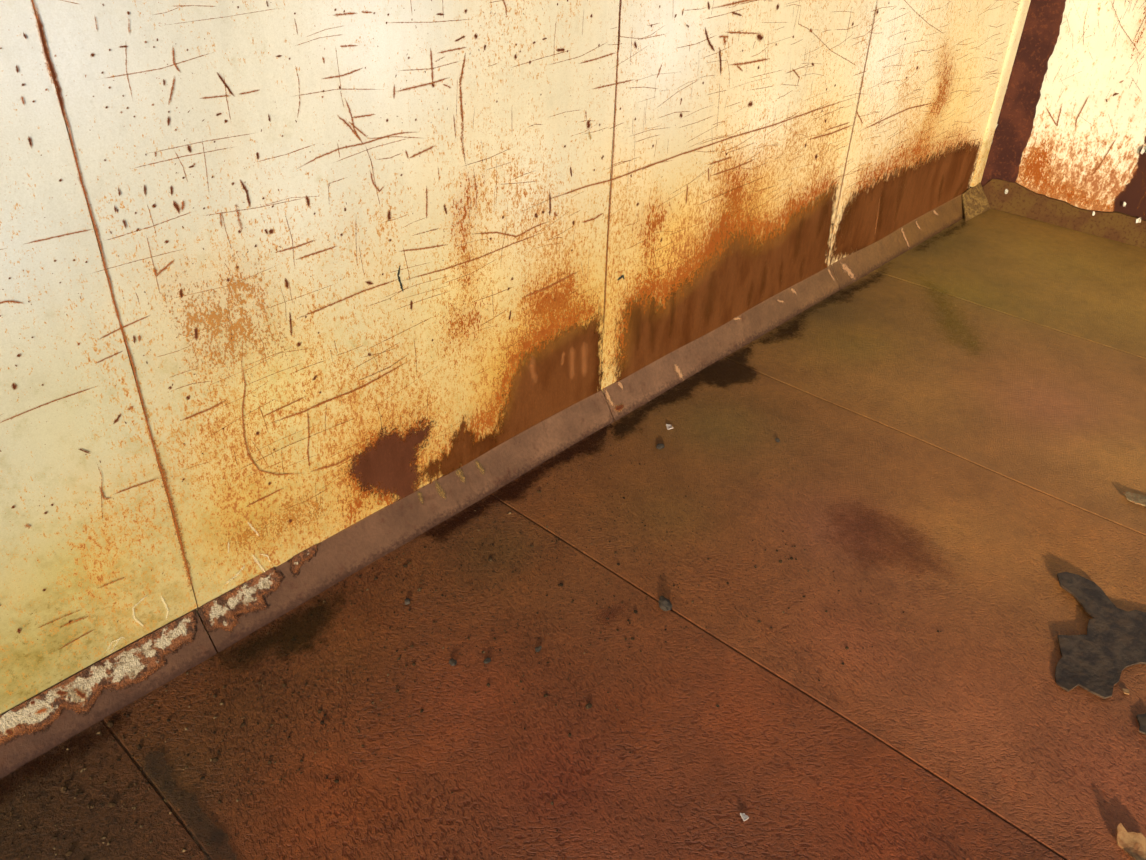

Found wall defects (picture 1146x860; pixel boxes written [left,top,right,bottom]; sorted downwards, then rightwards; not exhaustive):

rust [23,0,198,591]
rust [144,248,295,399]
rust [210,0,981,564]
leakage [416,142,982,540]
rust [1019,133,1146,220]
leakage [219,592,344,668]